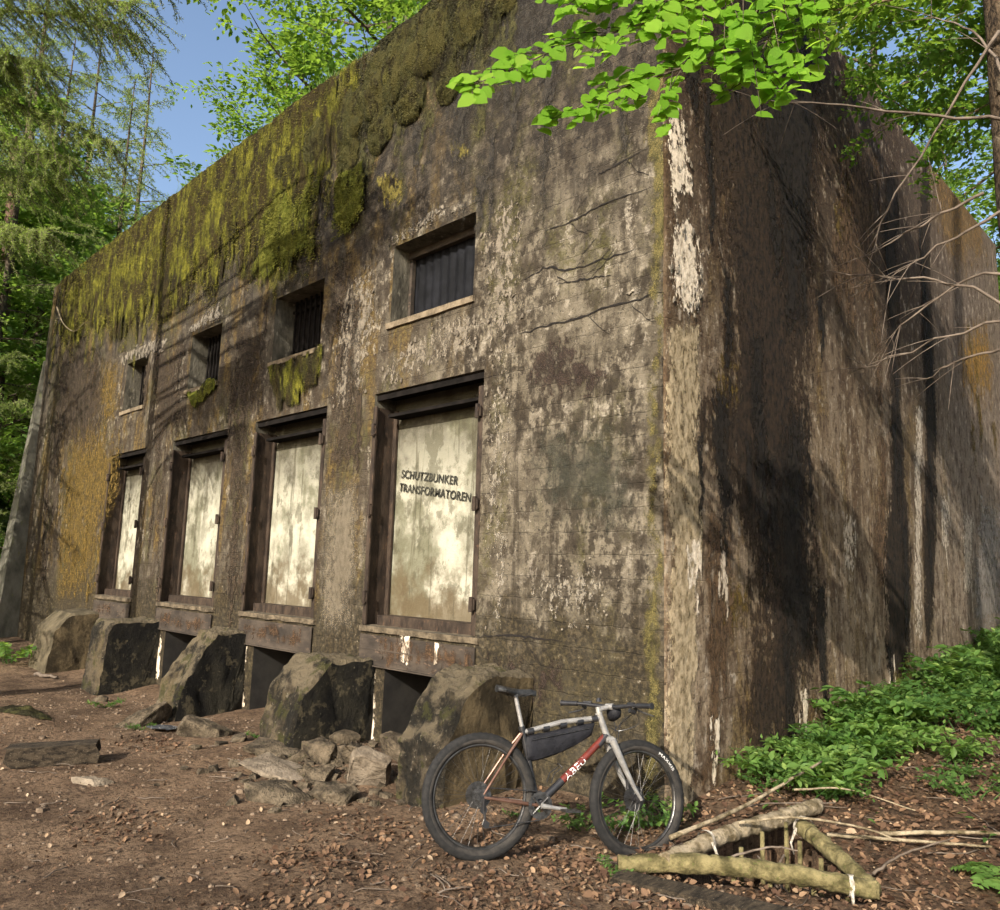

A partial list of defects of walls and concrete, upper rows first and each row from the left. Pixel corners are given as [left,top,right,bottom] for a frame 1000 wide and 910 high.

crack [524,133,648,284]
crack [520,292,664,334]
damp [668,0,951,794]
damp [963,513,975,621]